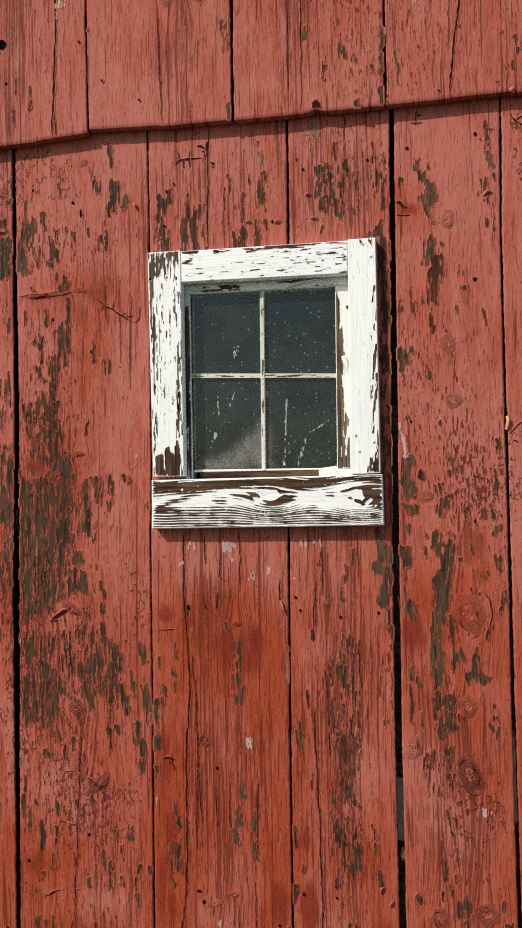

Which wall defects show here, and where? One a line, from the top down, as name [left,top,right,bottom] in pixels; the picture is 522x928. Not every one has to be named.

crack [51,0,59,136]
crack [449,0,462,96]
peeling [0,142,179,778]
peeling [143,140,507,928]